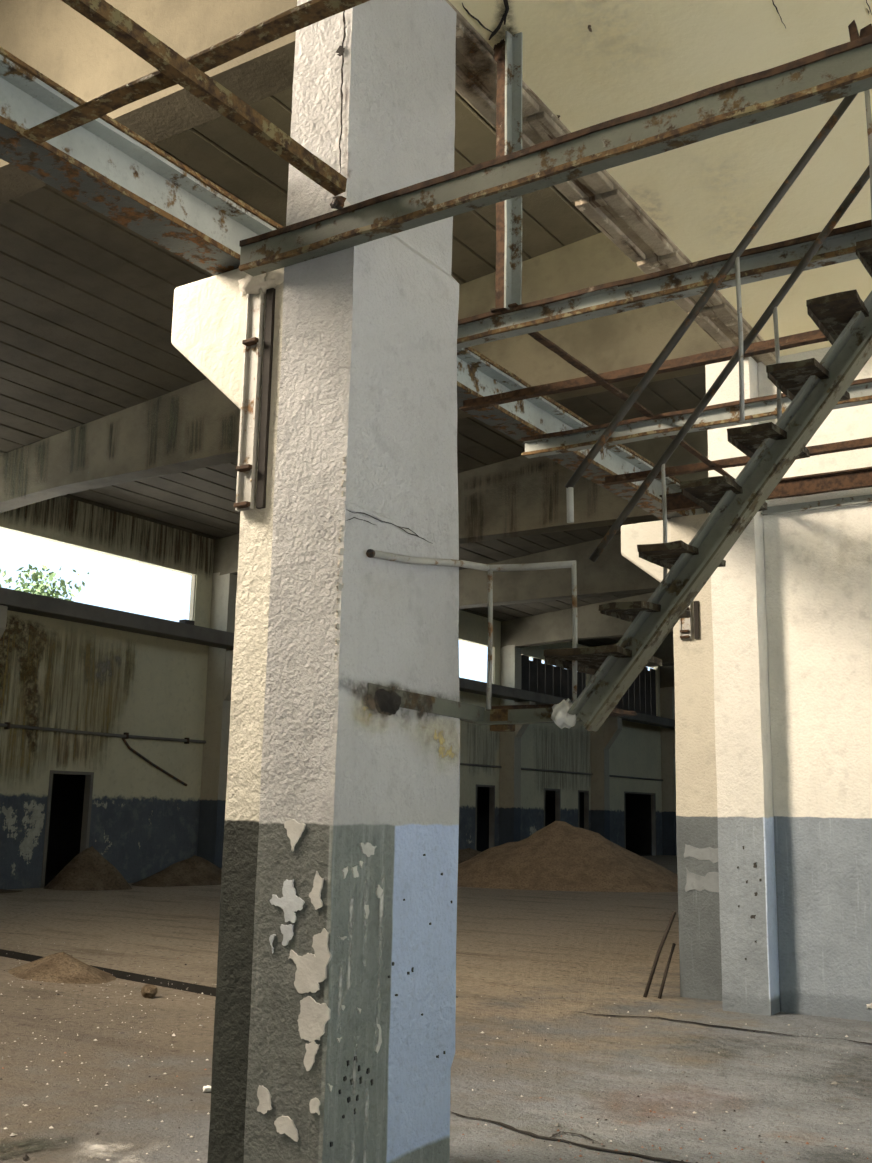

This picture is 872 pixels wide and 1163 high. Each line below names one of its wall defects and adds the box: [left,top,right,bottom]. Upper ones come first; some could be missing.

crack [462,0,509,40]
corrosion [0,0,872,271]
crack [346,509,433,544]
leakage [0,630,130,776]
corrosion [353,683,441,718]
peeling [0,800,45,875]
peeling [341,842,376,879]
peeling [364,885,383,919]
peeling [269,871,361,1071]
peeling [374,1023,382,1053]
peeling [257,1085,299,1142]
crack [450,1111,691,1163]